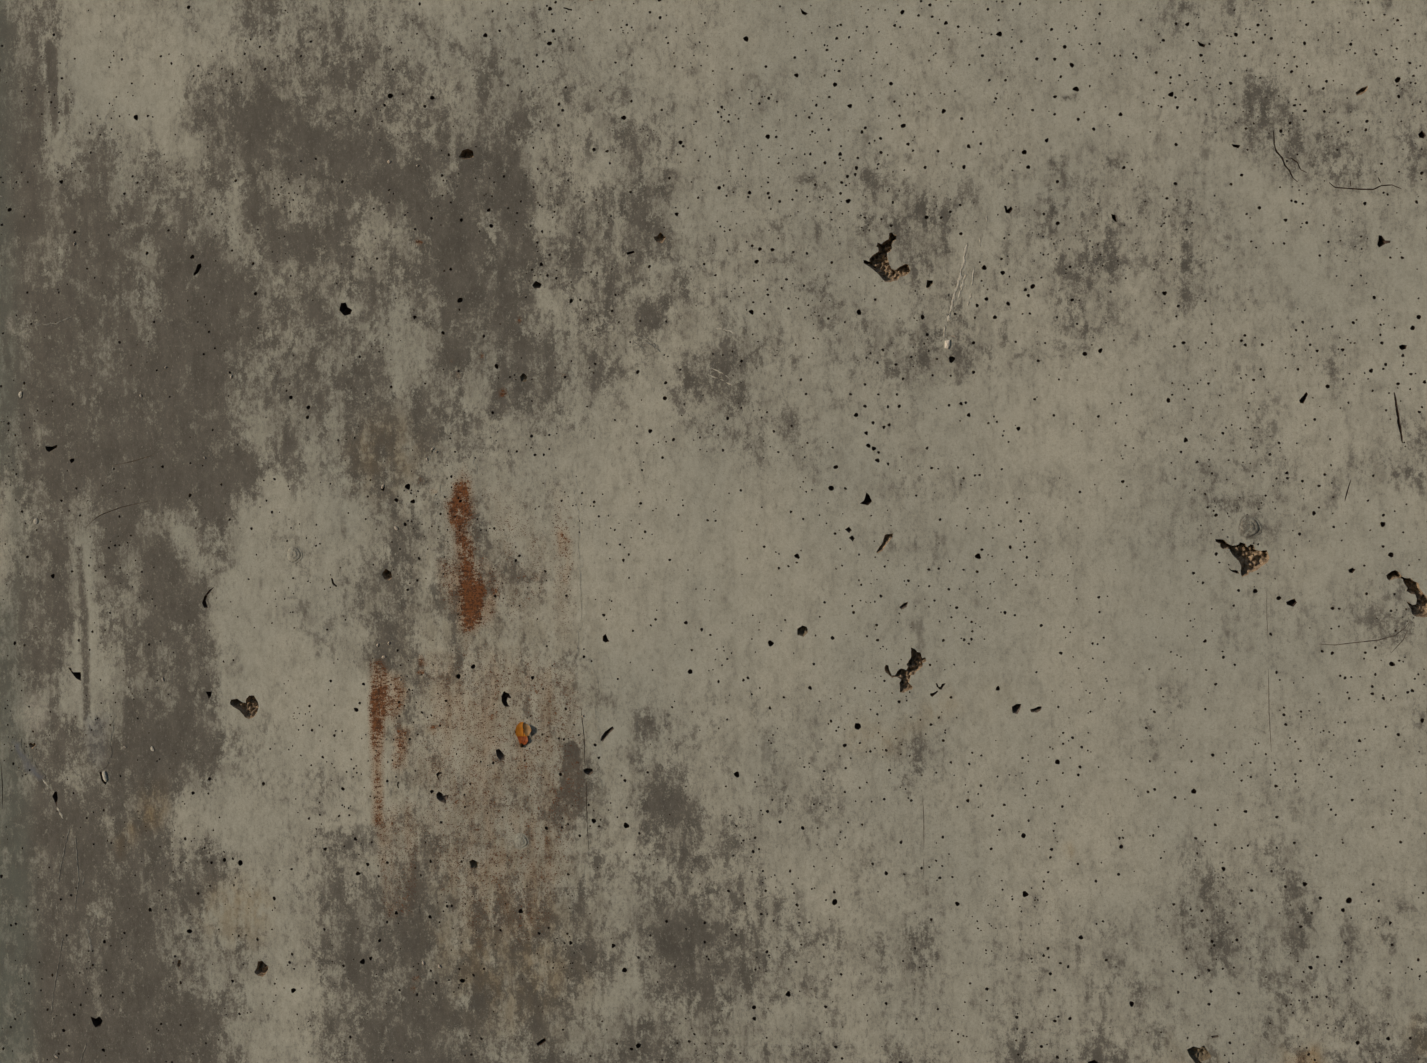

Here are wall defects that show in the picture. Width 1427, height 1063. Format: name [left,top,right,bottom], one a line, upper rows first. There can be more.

spalling [864,232,910,282]
leakage [669,306,766,428]
leakage [0,0,723,1063]
spalling [1215,539,1270,577]
spalling [1386,570,1427,617]
corrosion [362,453,602,967]
spalling [884,648,926,693]
leakage [304,698,859,1063]
leakage [877,924,941,1016]
leakage [989,957,1228,1063]
leakage [1177,885,1427,1063]